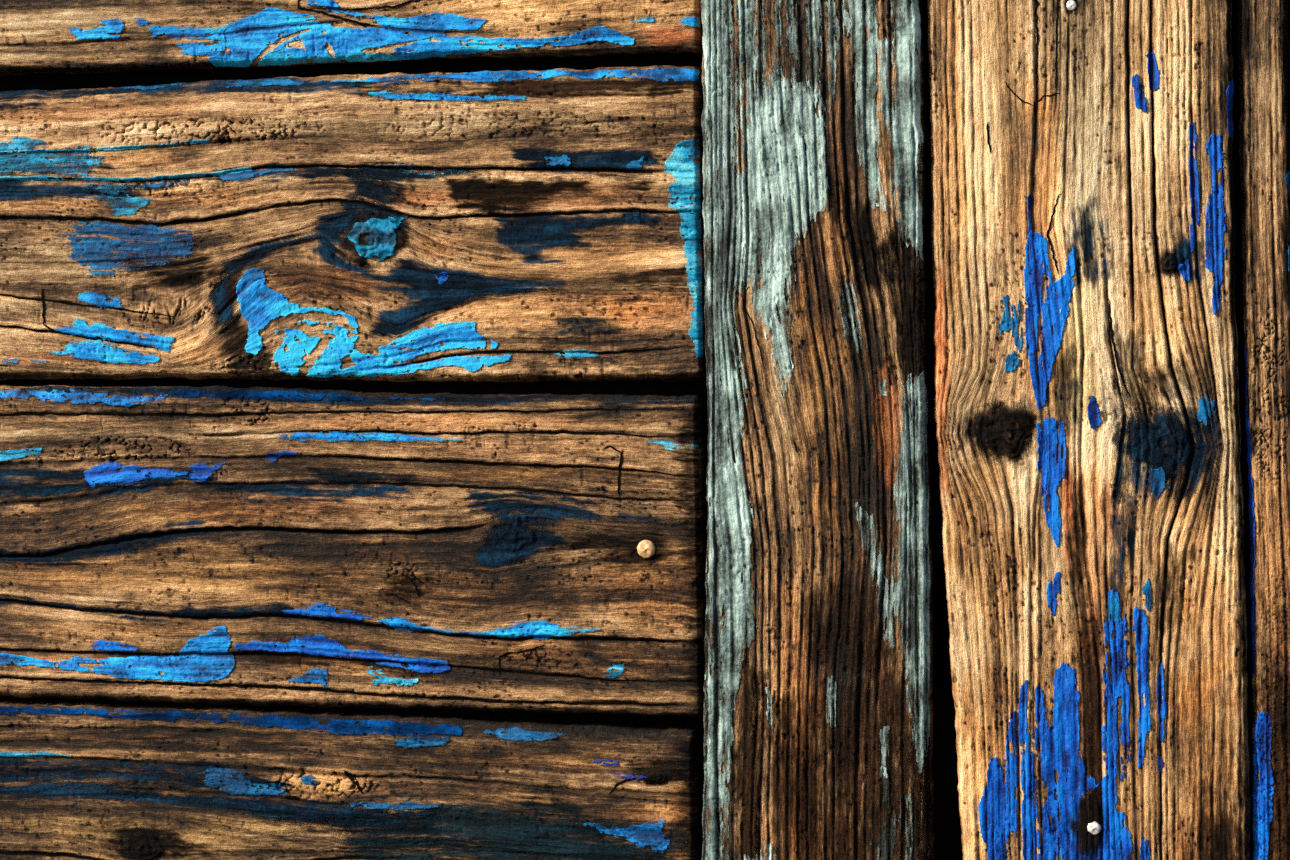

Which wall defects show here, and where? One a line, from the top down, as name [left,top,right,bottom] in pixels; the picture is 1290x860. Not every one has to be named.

peeling [1178,80,1233,315]
peeling [0,0,931,860]
peeling [995,195,1075,547]
peeling [978,572,1167,860]
peeling [1252,711,1274,860]